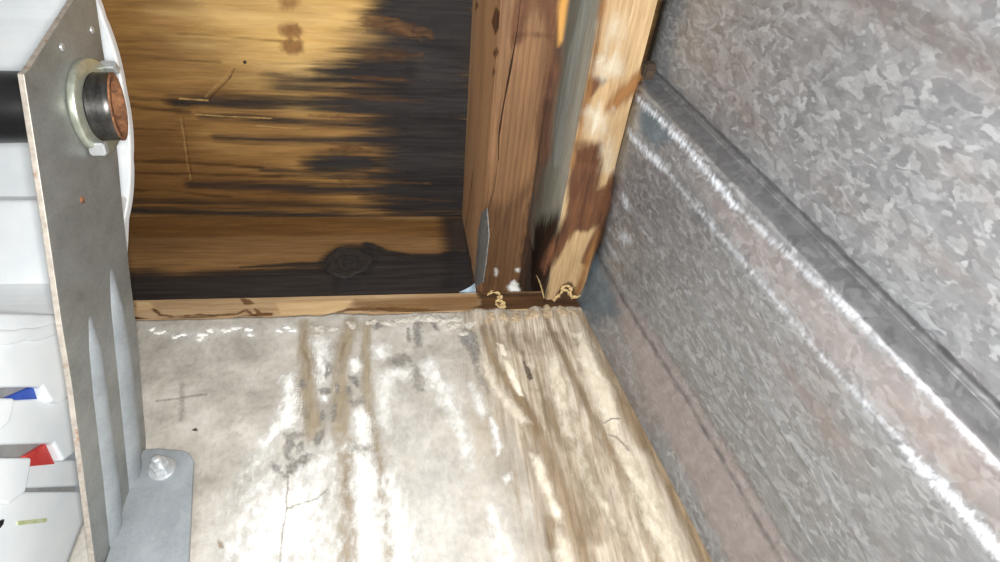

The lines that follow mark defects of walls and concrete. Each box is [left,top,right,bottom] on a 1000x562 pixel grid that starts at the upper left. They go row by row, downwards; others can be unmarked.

leakage [130,0,712,562]